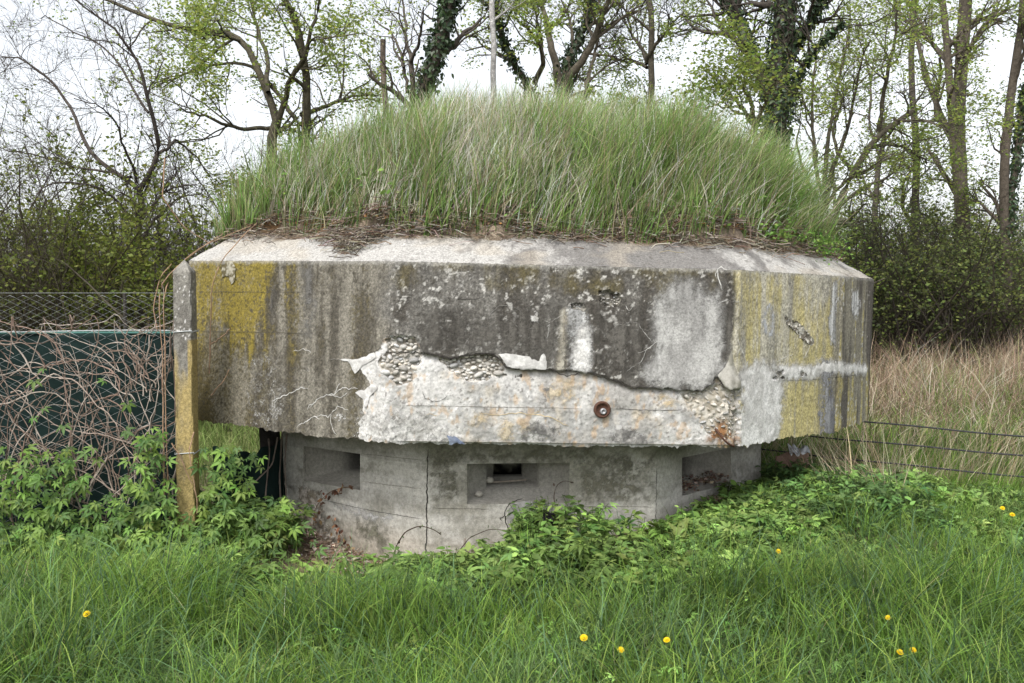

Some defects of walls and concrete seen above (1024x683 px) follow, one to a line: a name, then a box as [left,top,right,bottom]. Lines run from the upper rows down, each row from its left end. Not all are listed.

spalling [784,315,814,345]
efflorescence [828,281,839,344]
efflorescence [852,292,861,318]
spalling [340,279,741,448]
crack [273,386,358,434]
crack [423,449,431,553]